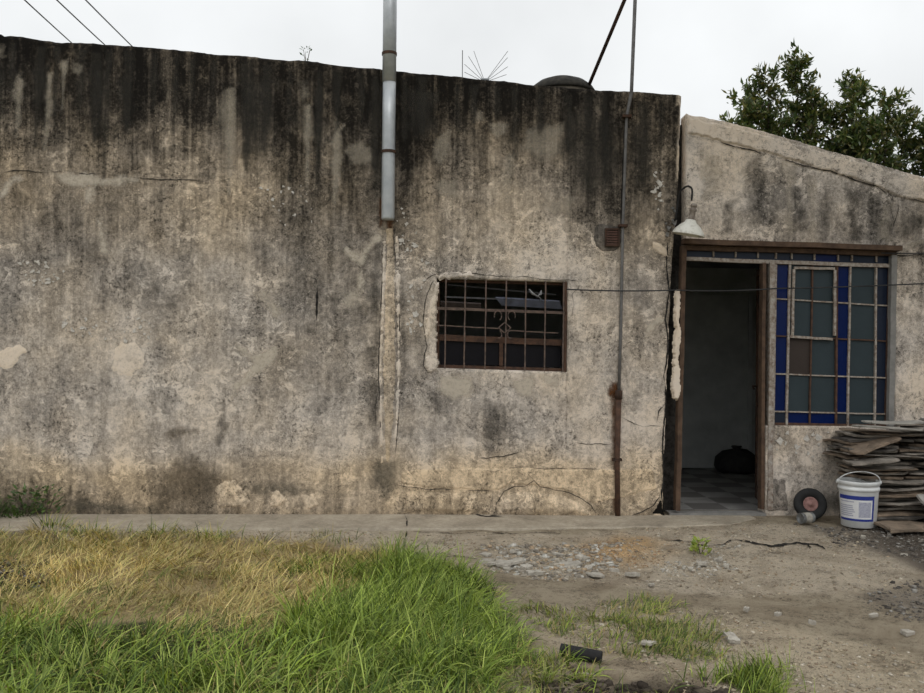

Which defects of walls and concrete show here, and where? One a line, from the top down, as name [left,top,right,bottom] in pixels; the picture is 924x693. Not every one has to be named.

leakage [59,173,134,201]
crack [4,161,205,182]
crack [692,136,923,235]
rust [609,383,618,470]
crack [393,451,594,559]